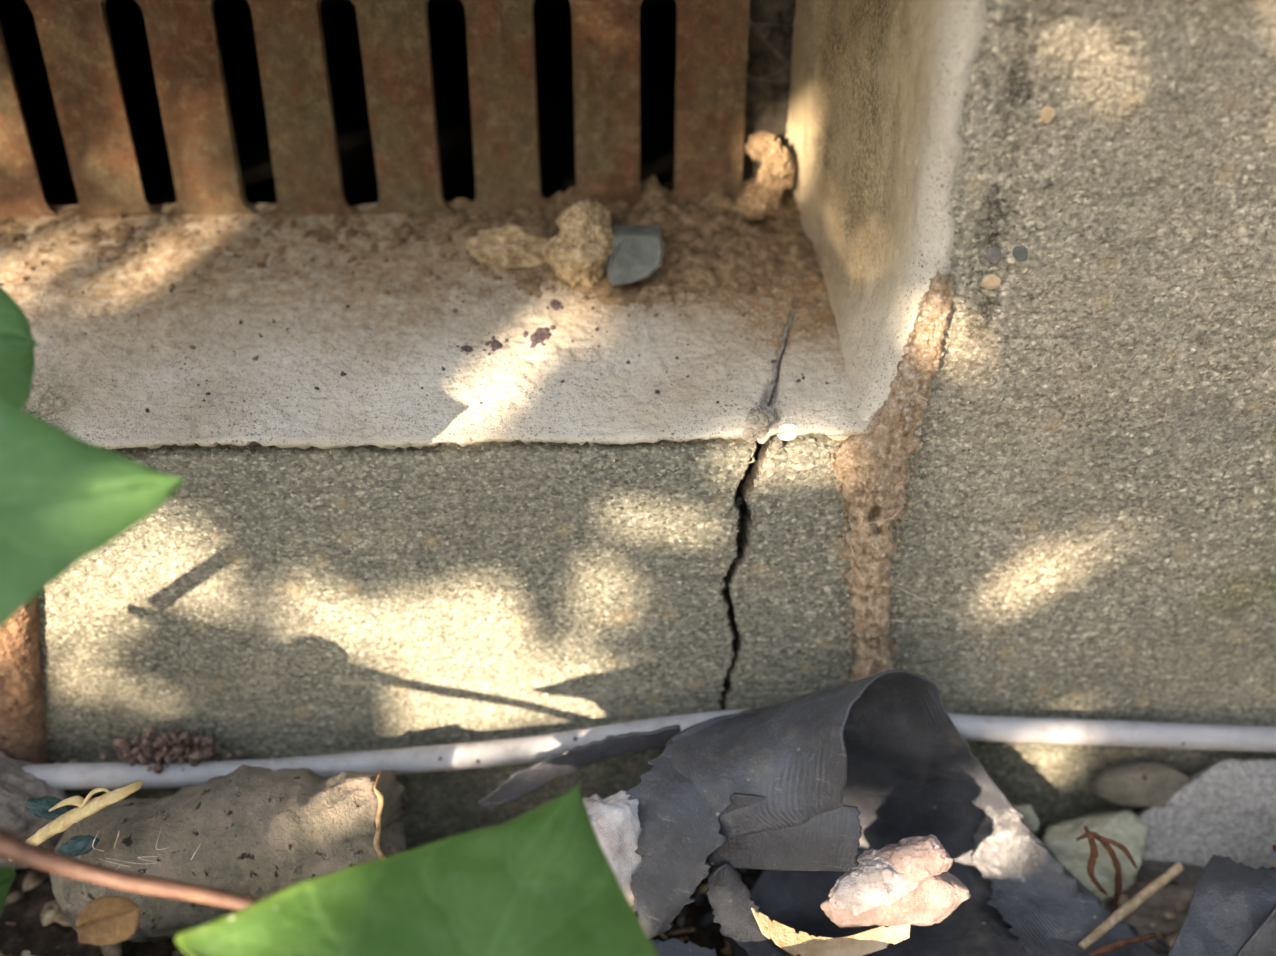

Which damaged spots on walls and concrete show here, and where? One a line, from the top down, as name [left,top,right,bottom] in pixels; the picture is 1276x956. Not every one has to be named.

crack [760,301,796,407]
crack [711,438,772,711]